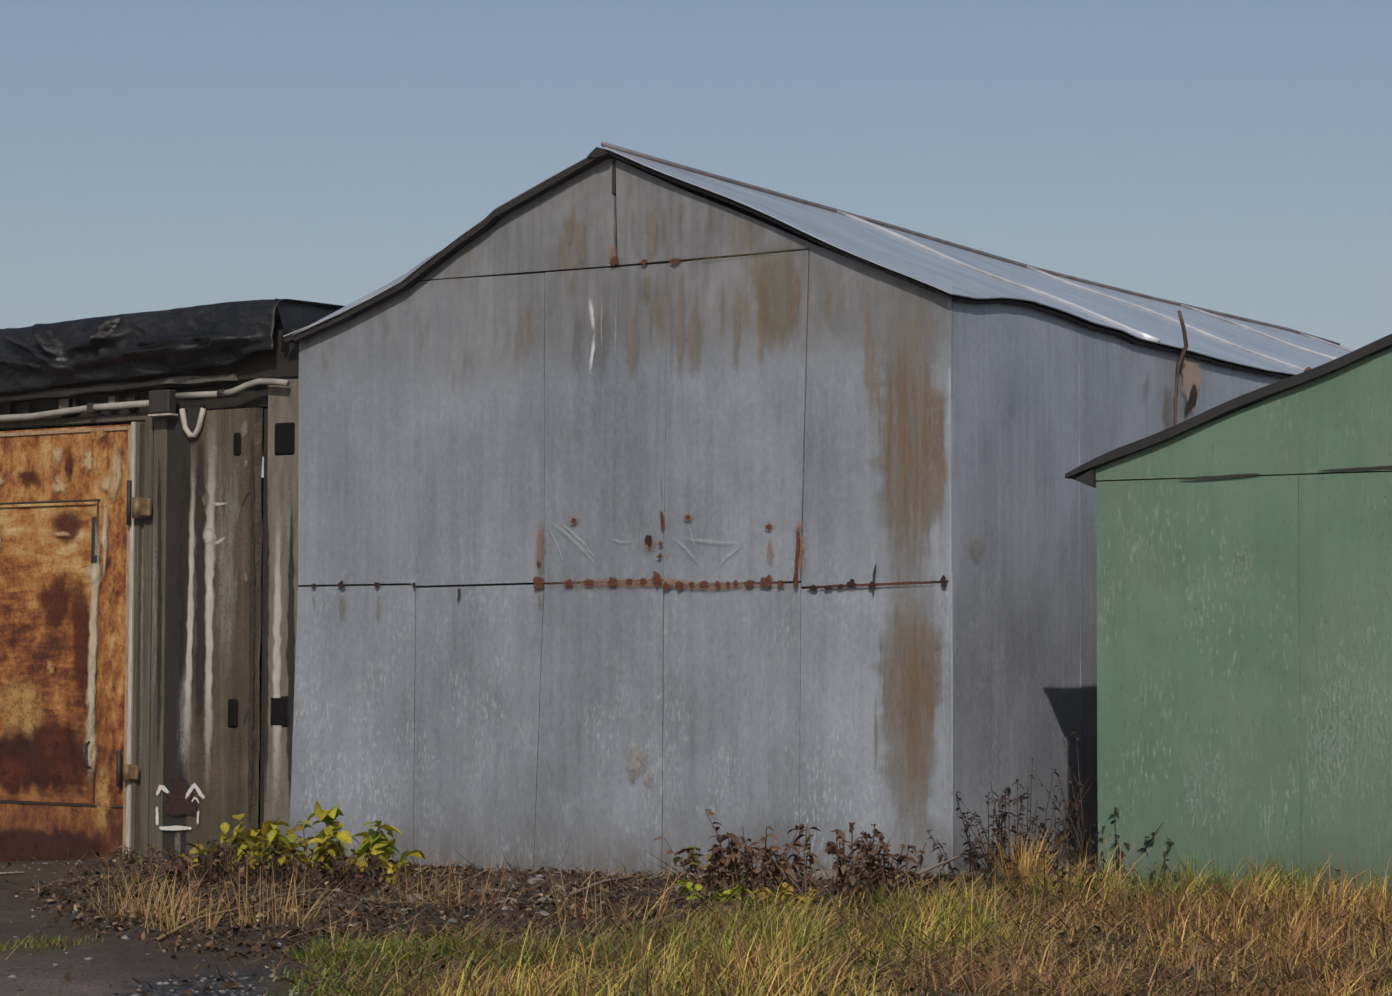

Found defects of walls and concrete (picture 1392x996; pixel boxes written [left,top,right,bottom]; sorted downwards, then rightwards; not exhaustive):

rust [1164,357,1202,428]
leakage [140,444,239,758]
leakage [263,476,295,796]
rust [533,530,545,604]
rust [564,511,947,591]
rust [0,827,101,862]